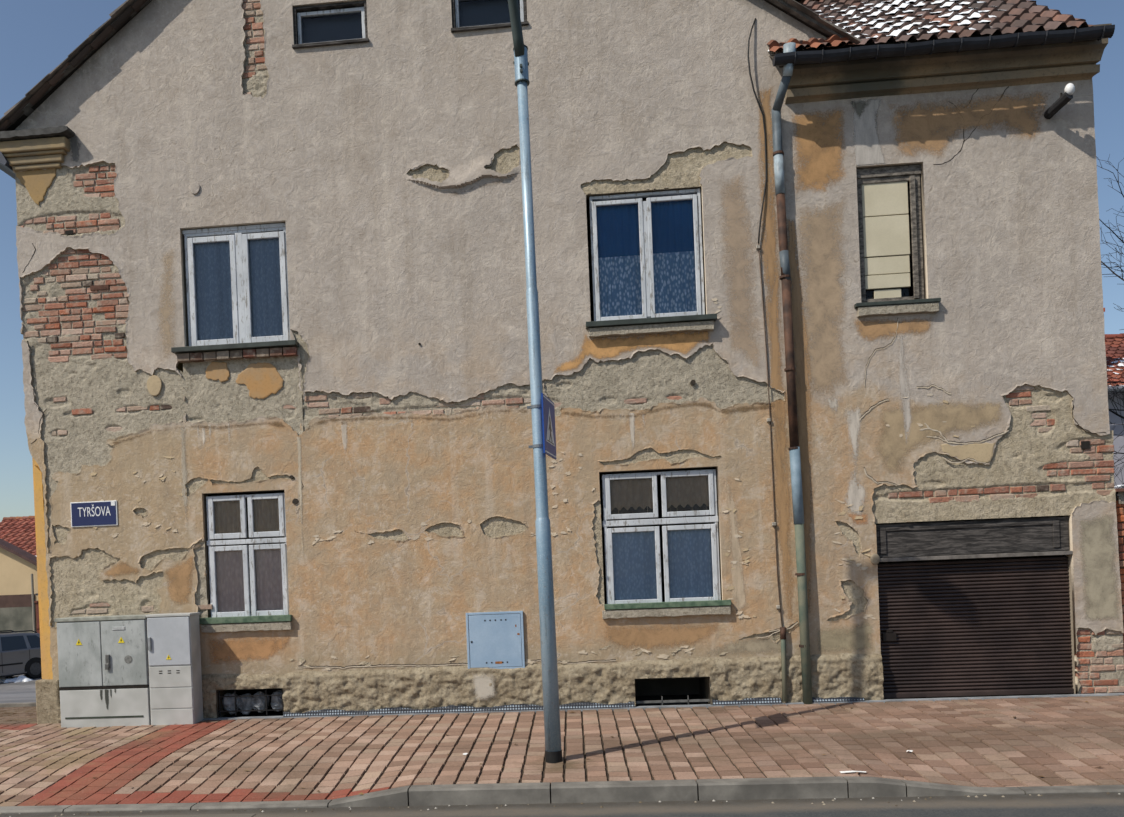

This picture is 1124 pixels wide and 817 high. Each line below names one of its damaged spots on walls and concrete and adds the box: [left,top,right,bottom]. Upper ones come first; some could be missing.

flaking render [240,0,270,99]
peeling [893,93,1045,155]
flaking render [485,143,521,174]
flaking render [580,140,754,198]
flaking render [15,159,786,629]
flaking render [826,382,1116,623]
flaking render [1074,627,1124,694]